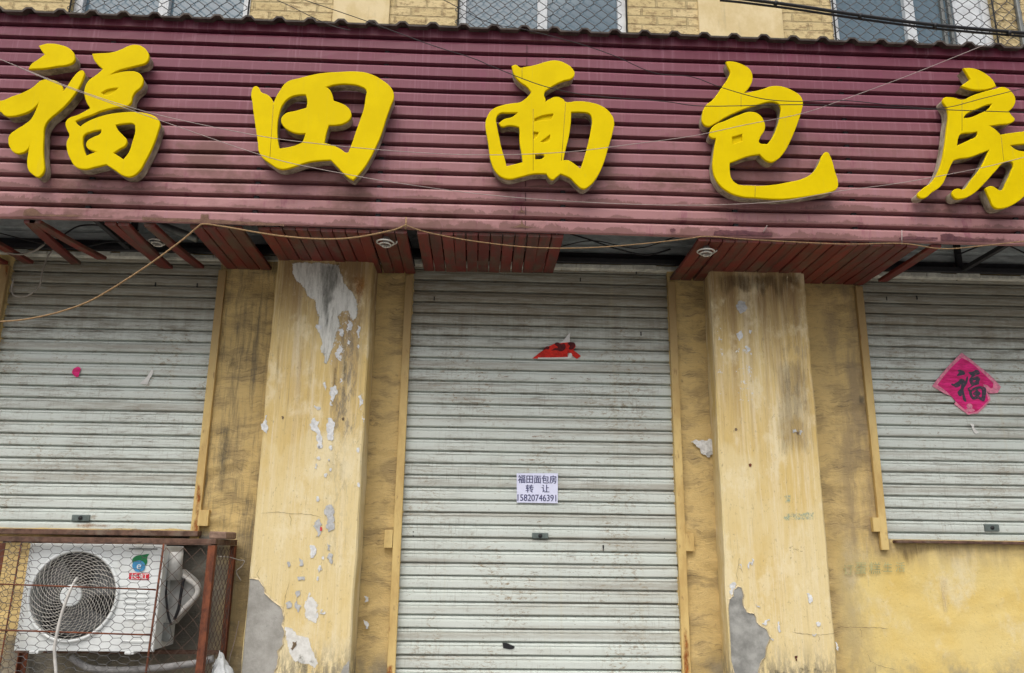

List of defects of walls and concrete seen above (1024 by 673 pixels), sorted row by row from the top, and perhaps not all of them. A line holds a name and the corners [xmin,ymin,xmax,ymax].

peeling [292,262,361,364]
peeling [693,439,713,458]
spalling [241,496,335,673]
spalling [728,582,780,673]